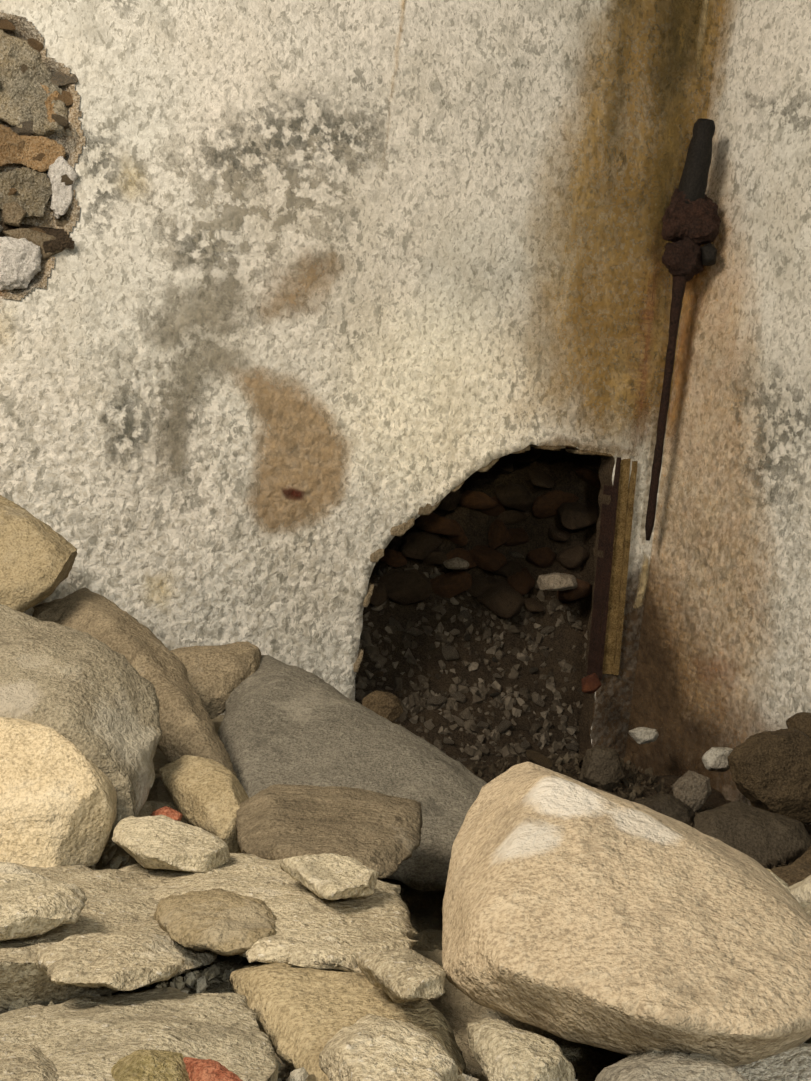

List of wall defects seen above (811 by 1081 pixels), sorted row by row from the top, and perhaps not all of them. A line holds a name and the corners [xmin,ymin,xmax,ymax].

flaking render [0,12,86,300]
water stain [544,0,730,433]
water stain [159,113,377,472]
water stain [105,404,146,456]
water stain [244,372,344,529]
spalling [390,501,441,536]
spalling [370,549,384,562]
spalling [363,583,374,607]
spalling [353,647,363,673]